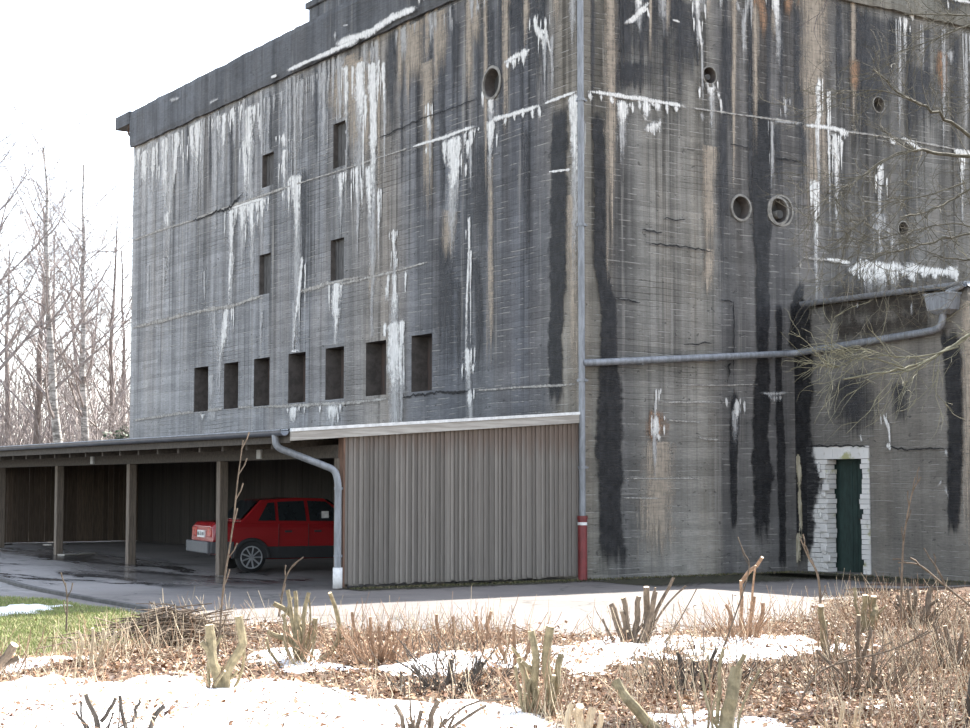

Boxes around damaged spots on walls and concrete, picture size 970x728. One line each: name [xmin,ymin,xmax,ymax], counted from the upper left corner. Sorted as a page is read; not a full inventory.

damp [134,0,970,565]
corrosion [752,0,776,114]